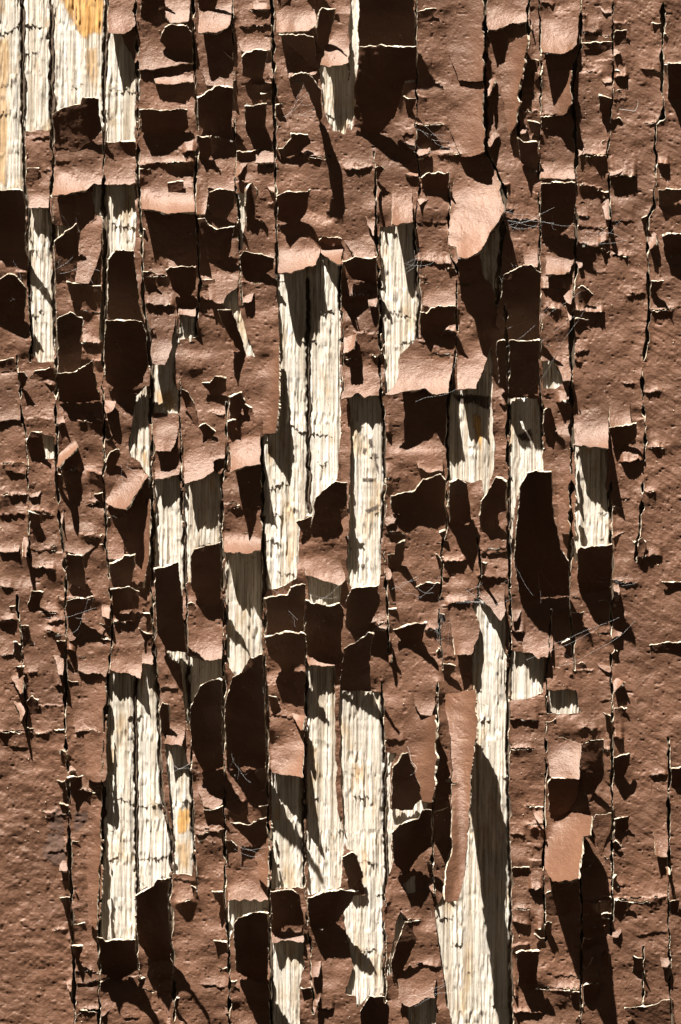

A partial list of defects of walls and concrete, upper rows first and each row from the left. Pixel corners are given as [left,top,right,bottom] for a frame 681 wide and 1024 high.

peeling [0,0,194,404]
peeling [140,140,275,357]
peeling [198,0,233,35]
peeling [185,34,274,165]
peeling [276,0,437,136]
crack [413,1,441,339]
peeling [366,0,637,602]
crack [1,0,203,1024]
peeling [74,216,448,1024]
peeling [431,578,553,1024]
crack [459,0,674,1024]
peeling [532,735,630,927]